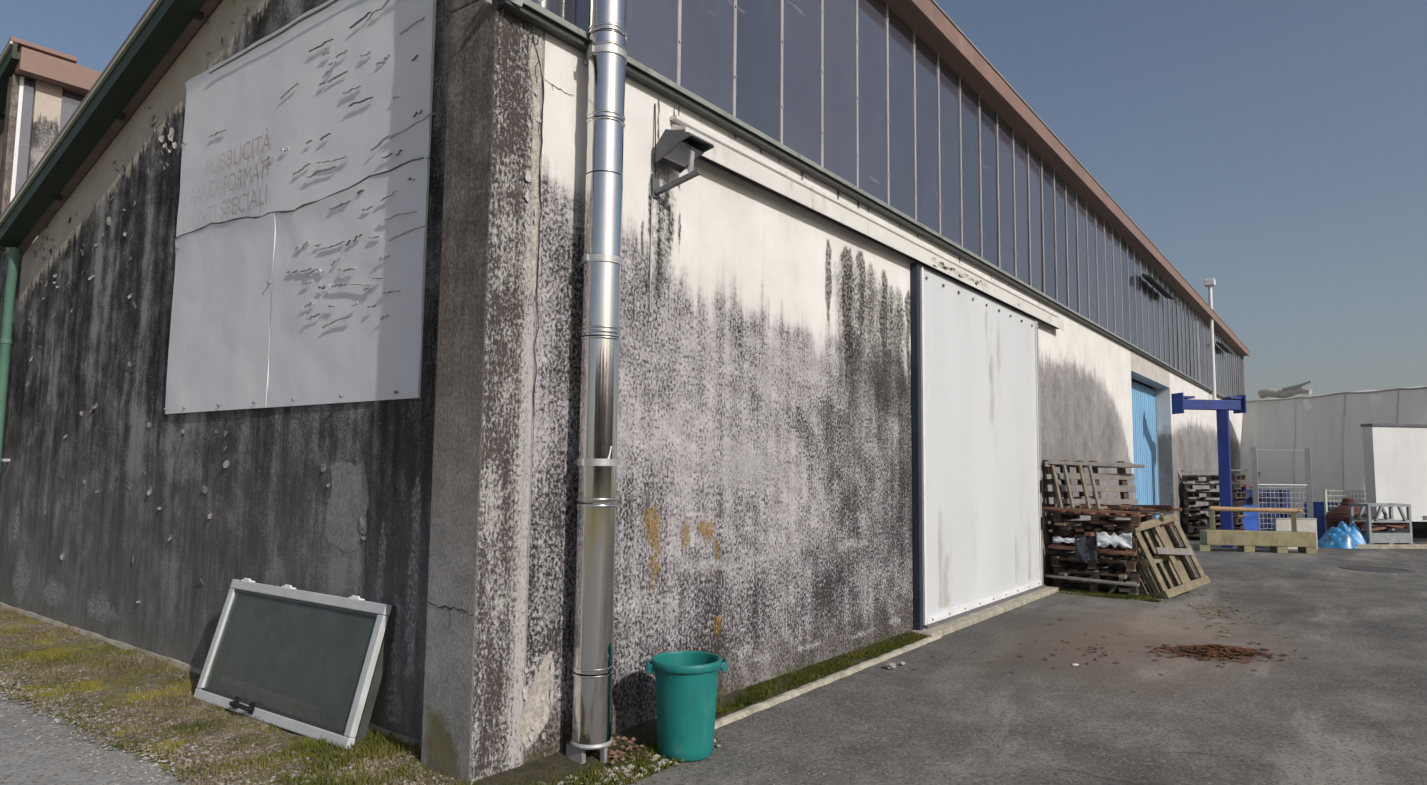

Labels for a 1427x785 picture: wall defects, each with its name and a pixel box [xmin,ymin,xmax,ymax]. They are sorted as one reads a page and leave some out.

water stain [641,166,681,282]
water stain [826,241,911,406]
water stain [376,477,421,724]
corrosion [645,508,660,589]
corrosion [681,521,719,573]
water stain [679,544,807,572]